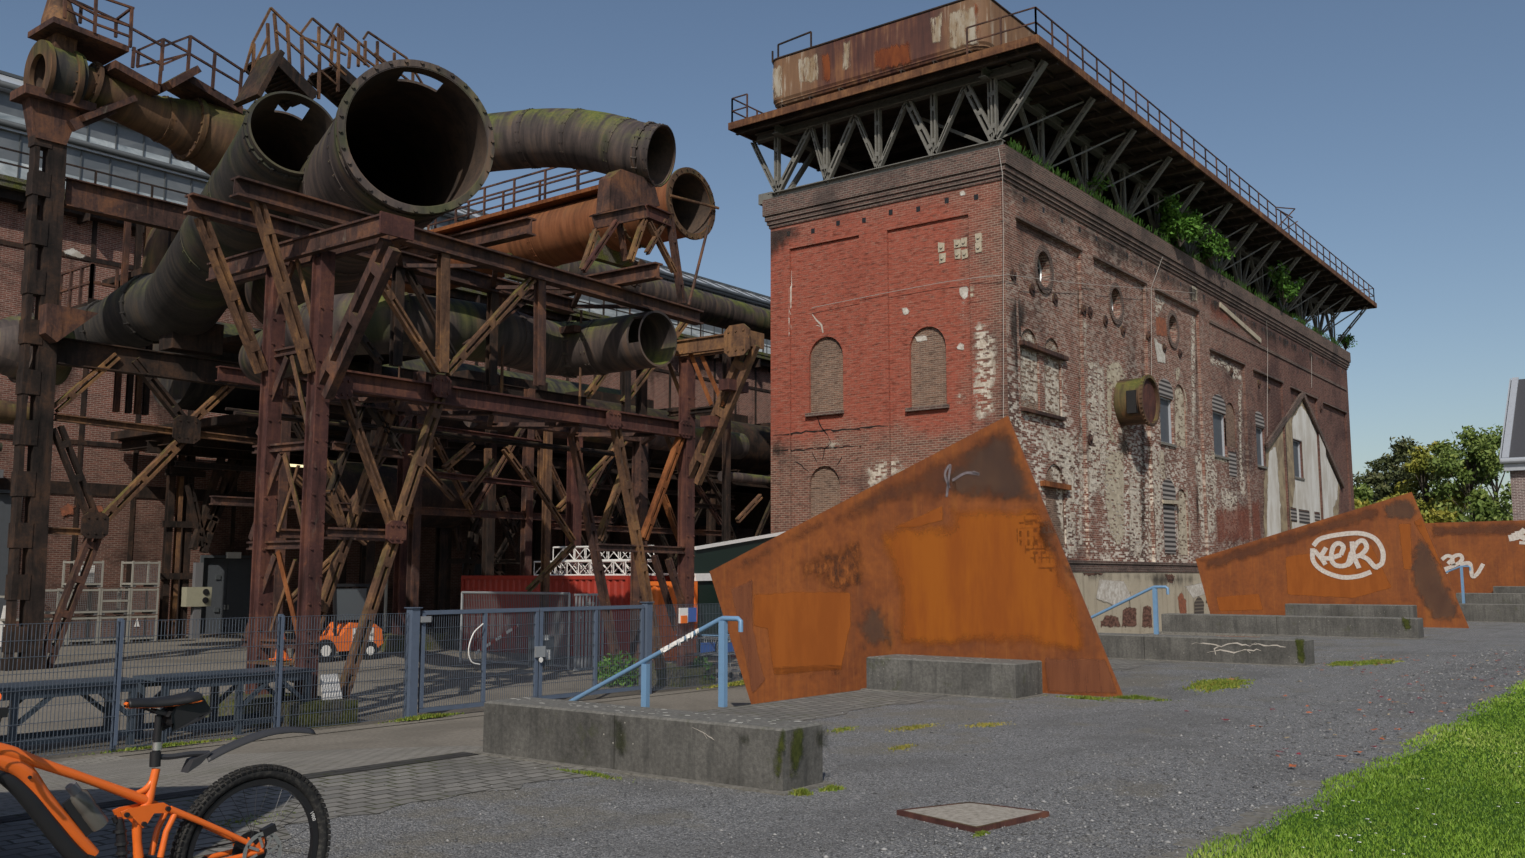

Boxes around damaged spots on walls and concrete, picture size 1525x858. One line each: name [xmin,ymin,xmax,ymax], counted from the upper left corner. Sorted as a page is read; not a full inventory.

rust [875,42,910,70]
peeling [959,324,996,419]
peeling [1020,296,1246,558]
rust [732,435,1081,692]
flaking render [1165,574,1207,614]
rust [1207,500,1525,619]